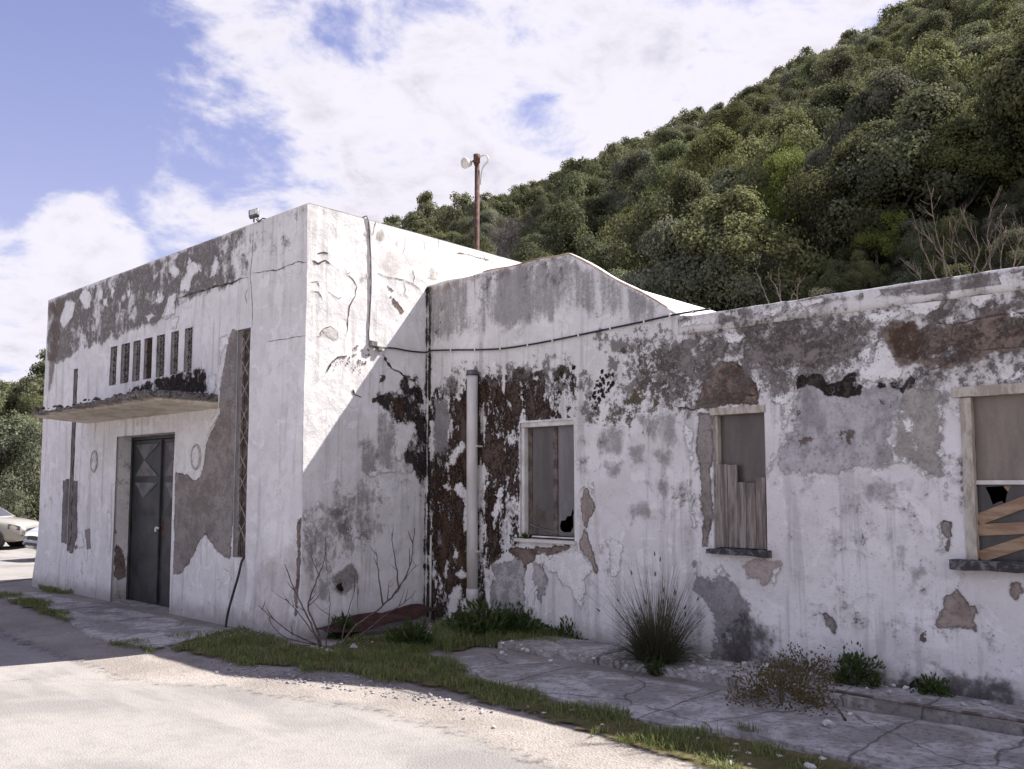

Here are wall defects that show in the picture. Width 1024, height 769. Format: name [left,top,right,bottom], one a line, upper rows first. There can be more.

peeling [60,284,131,328]
peeling [145,252,220,330]
crack [178,236,425,371]
crack [352,354,411,403]
spalling [173,329,237,575]
peeling [367,418,435,478]
water stain [363,258,1024,623]
spalling [857,341,949,501]
spalling [61,479,91,553]
peeling [443,546,467,618]
peeling [490,482,624,615]
spalling [919,589,978,642]